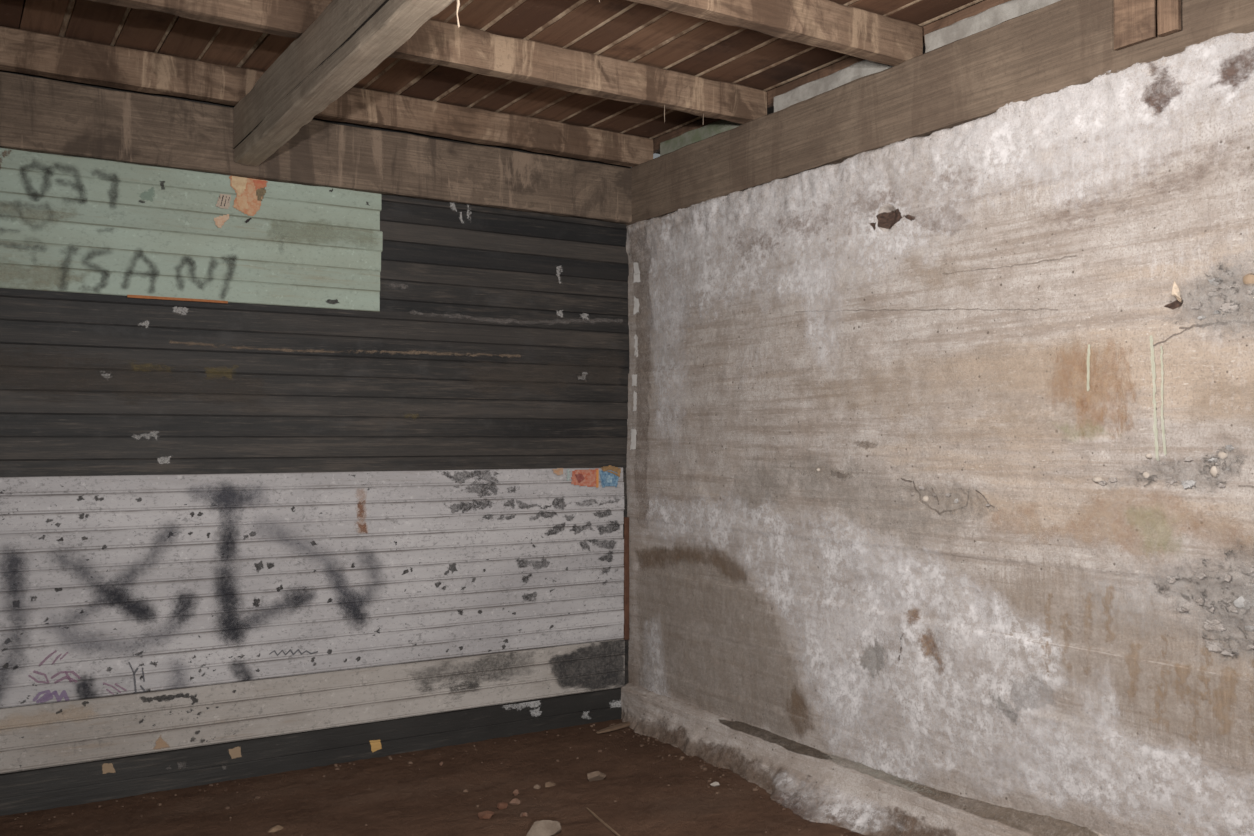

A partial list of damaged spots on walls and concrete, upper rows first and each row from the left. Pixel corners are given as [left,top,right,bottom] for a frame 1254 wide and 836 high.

spalling [1172,265,1254,328]
peeling [436,470,620,585]
peeling [516,545,554,601]
spalling [1154,546,1254,659]
leakage [639,499,1254,836]